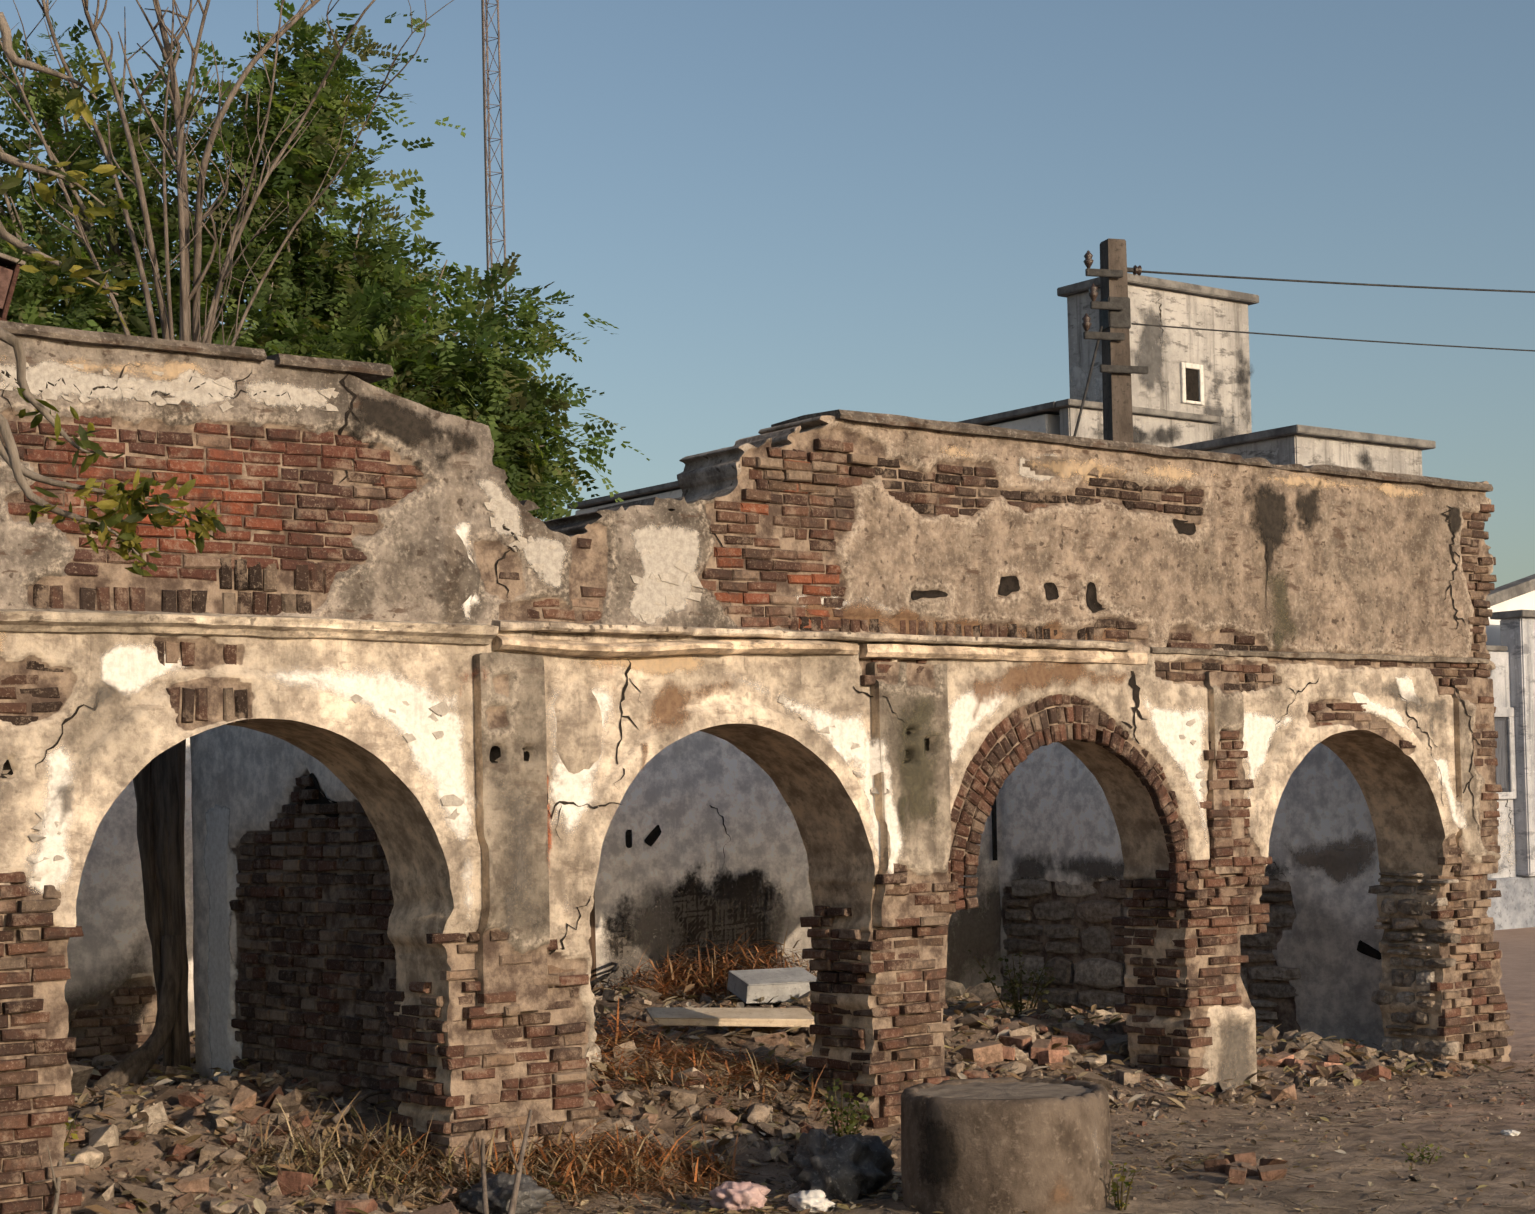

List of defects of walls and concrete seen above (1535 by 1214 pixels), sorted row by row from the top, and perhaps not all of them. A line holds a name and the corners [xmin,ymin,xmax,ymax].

leakage [1135,309,1166,389]
crack [36,696,98,765]
spalling [0,361,424,616]
crack [547,658,646,840]
spalling [629,438,1204,642]
crack [1121,671,1147,744]
leakage [1247,482,1321,650]
spalling [1308,504,1498,766]
crack [1441,506,1467,640]
spalling [0,748,157,1214]
spalling [204,776,605,1187]
spalling [777,688,1302,1128]